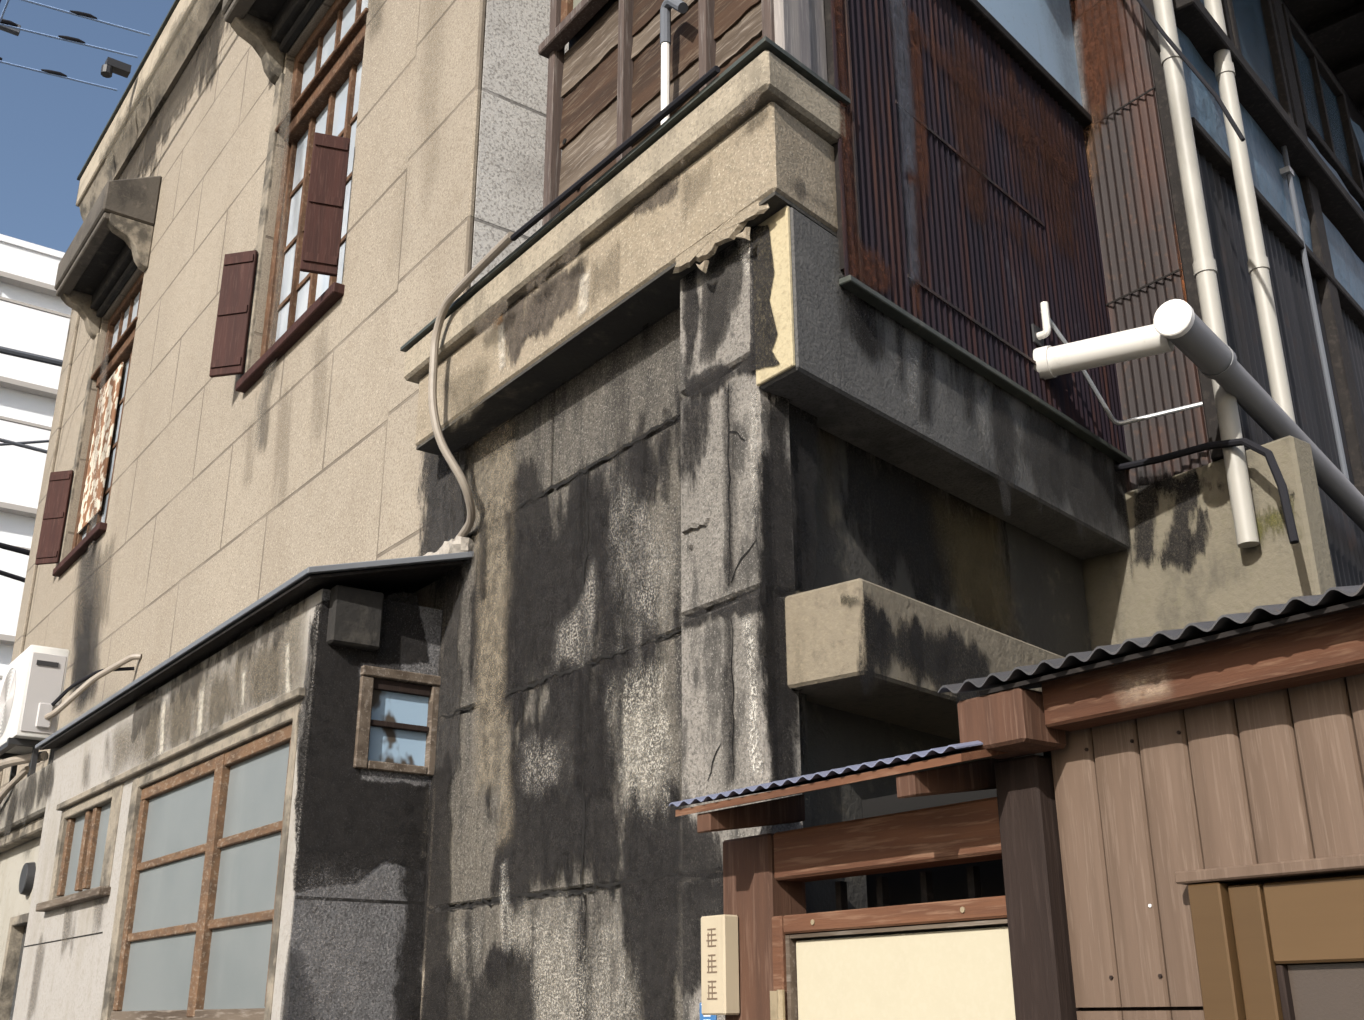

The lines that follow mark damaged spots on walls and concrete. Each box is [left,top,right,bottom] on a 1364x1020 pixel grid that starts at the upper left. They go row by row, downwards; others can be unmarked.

damp [118,7,228,180]
damp [735,90,760,115]
corrosion [832,0,891,292]
corrosion [1069,0,1123,191]
spalling [673,201,769,273]
damp [839,288,1221,704]
damp [106,225,822,1020]
spalling [746,622,761,772]
damp [27,939,42,1018]